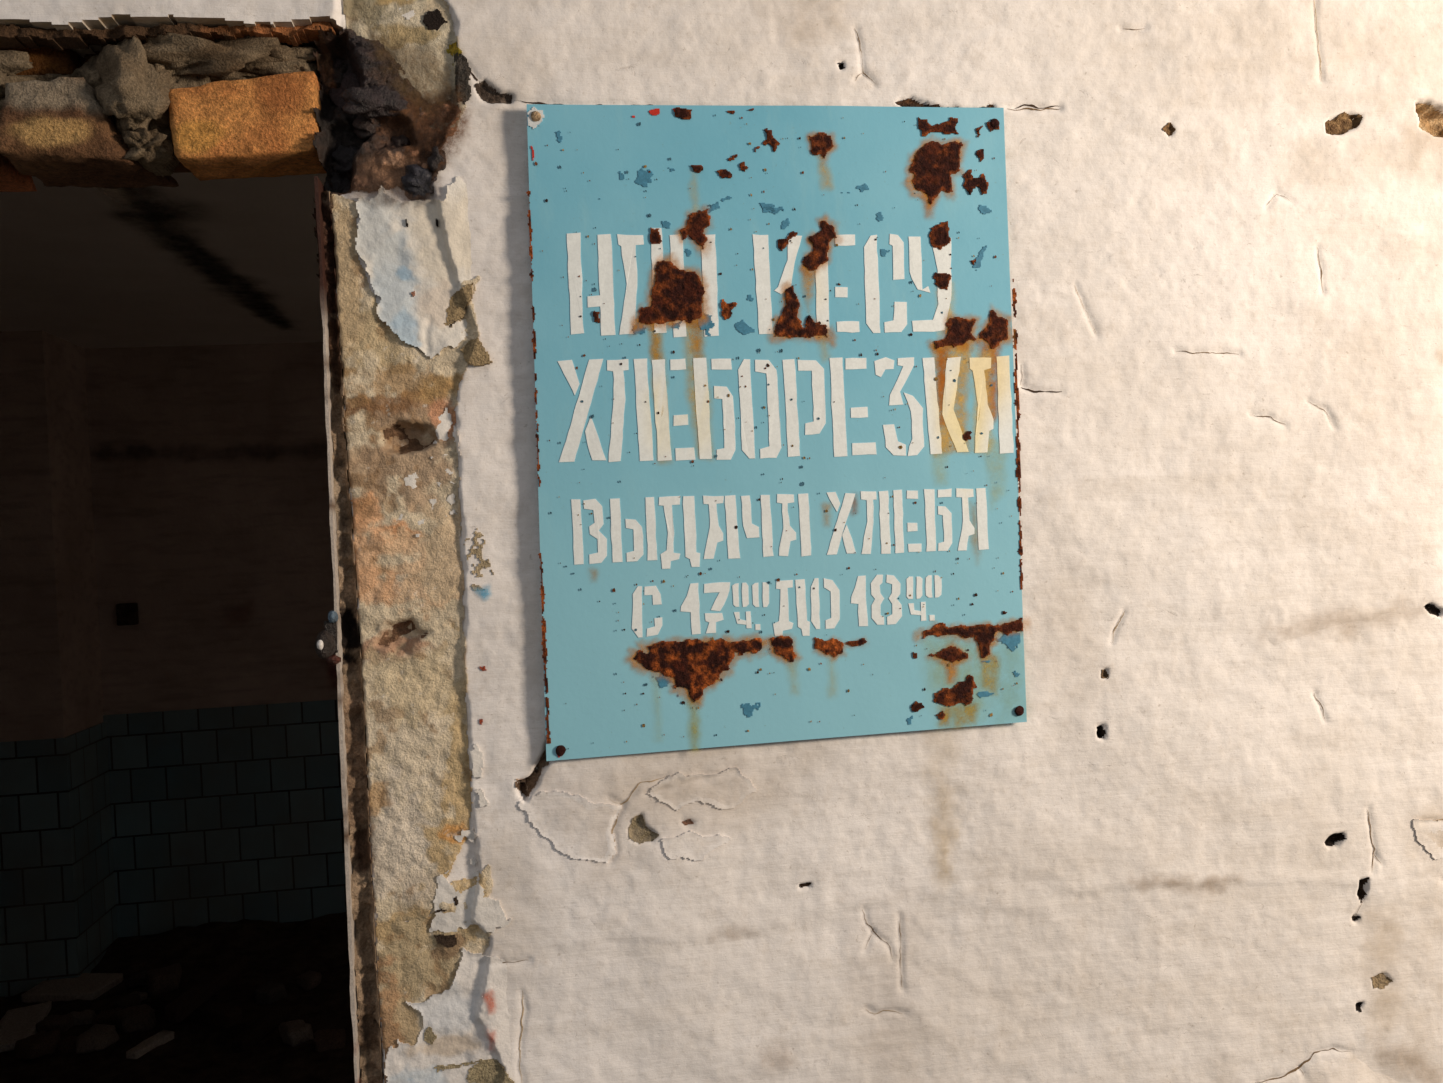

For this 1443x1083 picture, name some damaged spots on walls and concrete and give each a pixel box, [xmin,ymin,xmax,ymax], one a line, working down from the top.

spalling [1415,103,1443,138]
spalling [0,0,514,1083]
crack [1263,1048,1350,1082]